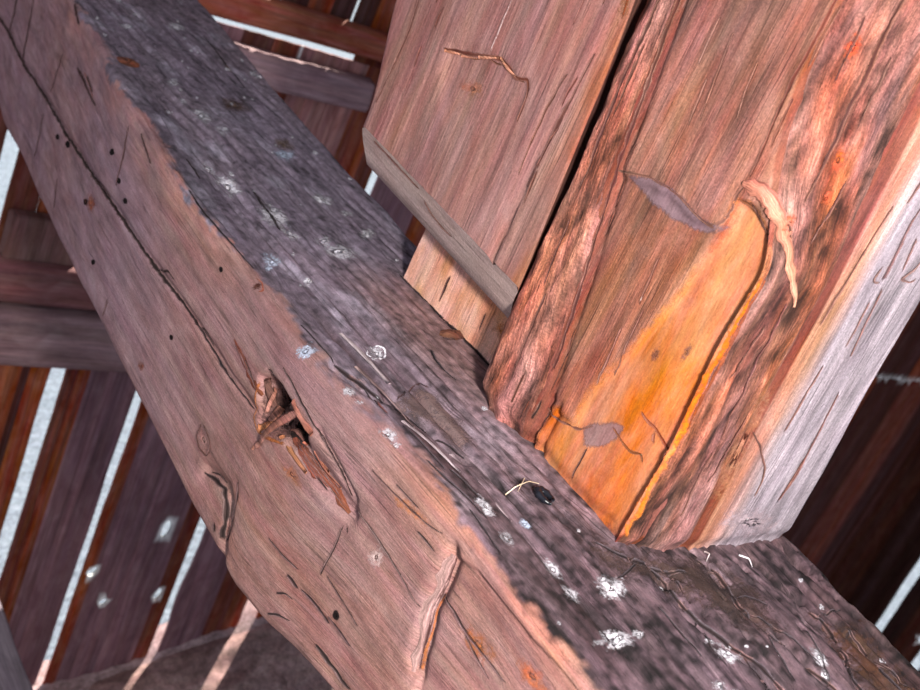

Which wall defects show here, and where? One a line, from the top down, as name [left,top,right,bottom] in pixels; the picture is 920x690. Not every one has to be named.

crack [0,17,255,409]
crack [253,192,280,230]
crack [519,54,595,201]
crack [531,0,681,426]
spalling [291,422,309,445]
crack [511,220,570,402]
crack [572,449,587,478]
peeling [535,170,798,536]